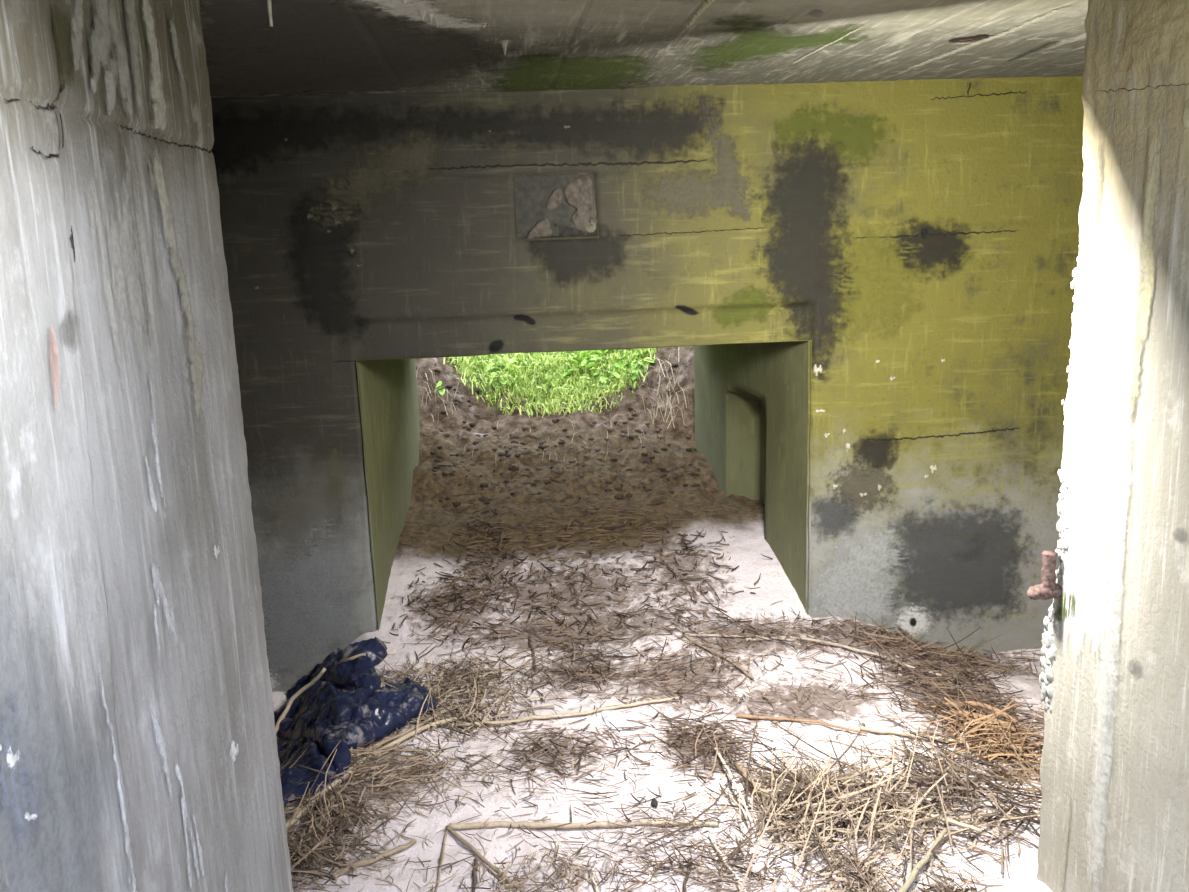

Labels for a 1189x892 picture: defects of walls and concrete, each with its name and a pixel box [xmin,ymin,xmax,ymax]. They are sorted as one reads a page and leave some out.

crack [4,80,65,158]
damp [142,0,168,131]
crack [120,125,214,154]
damp [199,0,511,97]
crack [932,83,1026,100]
crack [1009,41,1060,61]
damp [759,138,851,379]
crack [871,428,1018,440]
damp [810,498,1023,624]
spalling [1055,469,1071,581]
spalling [1039,601,1059,713]
damp [1064,438,1130,883]